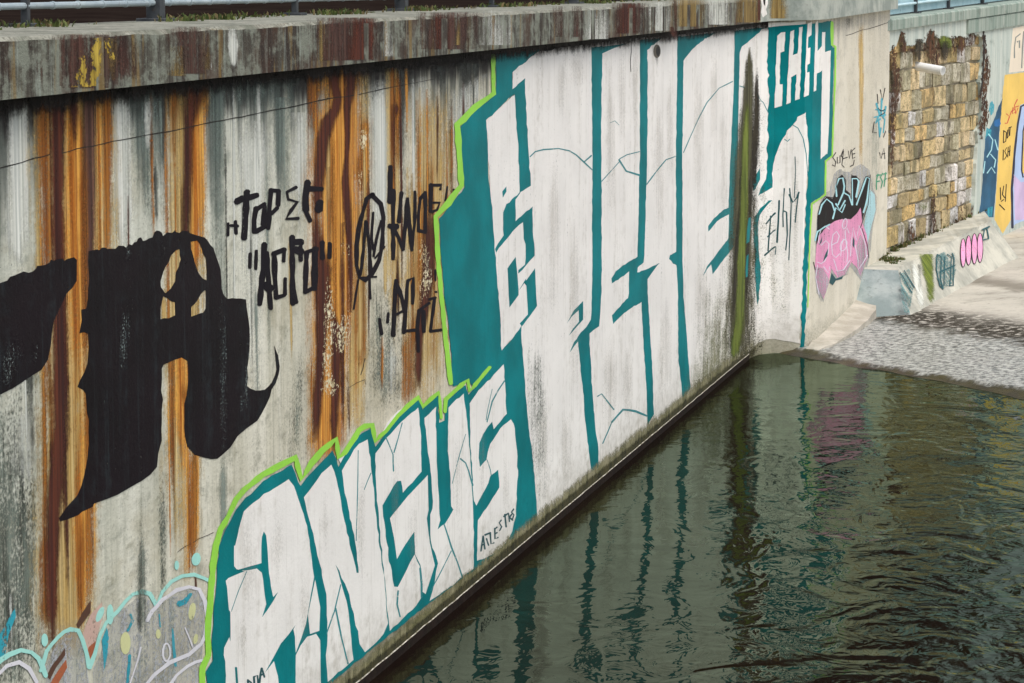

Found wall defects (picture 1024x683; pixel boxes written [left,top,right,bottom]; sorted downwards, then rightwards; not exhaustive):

damp [0,376,41,683]
rust [33,35,137,647]
peeling [72,38,115,87]
rust [149,87,208,319]
rust [165,358,199,573]
rust [307,17,378,459]
damp [0,2,768,405]
rust [384,68,464,404]
rust [418,12,484,49]
damp [331,71,775,683]
rust [553,6,582,37]
rust [613,3,650,34]